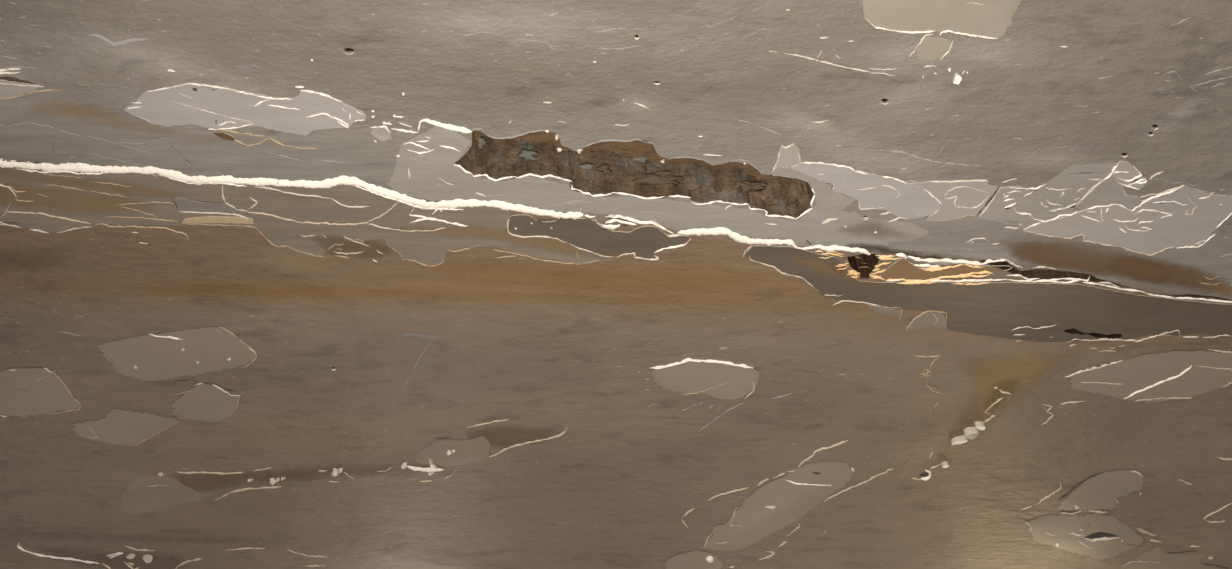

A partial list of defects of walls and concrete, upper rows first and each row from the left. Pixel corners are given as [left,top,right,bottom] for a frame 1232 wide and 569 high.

water stain [37,174,176,222]
crack [0,159,871,255]
peeling [0,68,1232,352]
crack [904,253,1232,303]
crack [17,543,328,569]